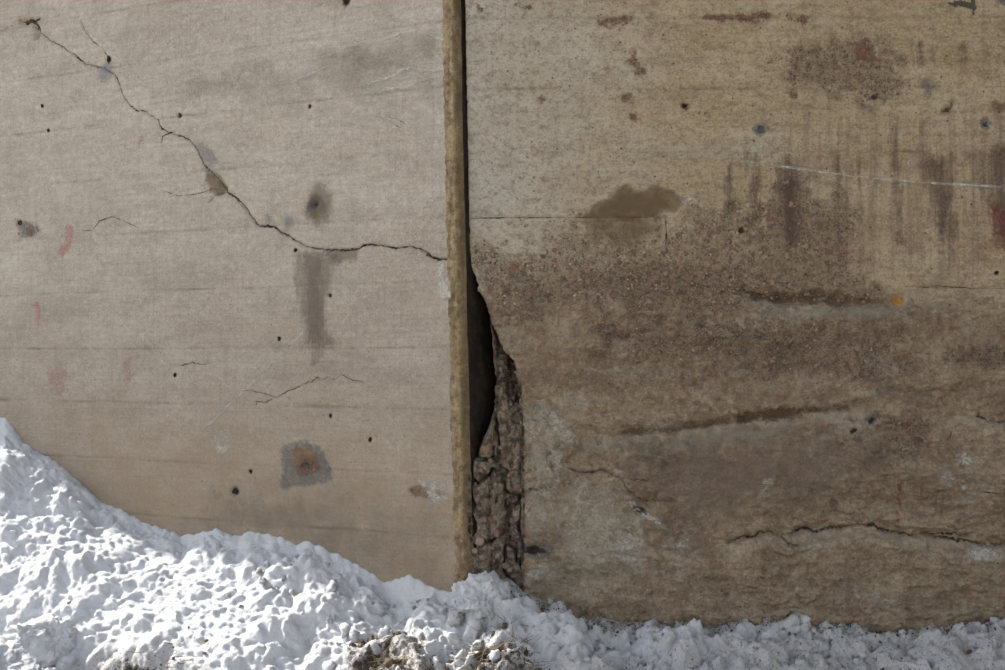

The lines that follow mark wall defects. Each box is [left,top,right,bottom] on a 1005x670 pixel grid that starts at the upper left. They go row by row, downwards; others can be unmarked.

crack [10,19,448,261]
damp [587,185,696,239]
spalling [471,169,937,590]
crack [729,523,1005,547]